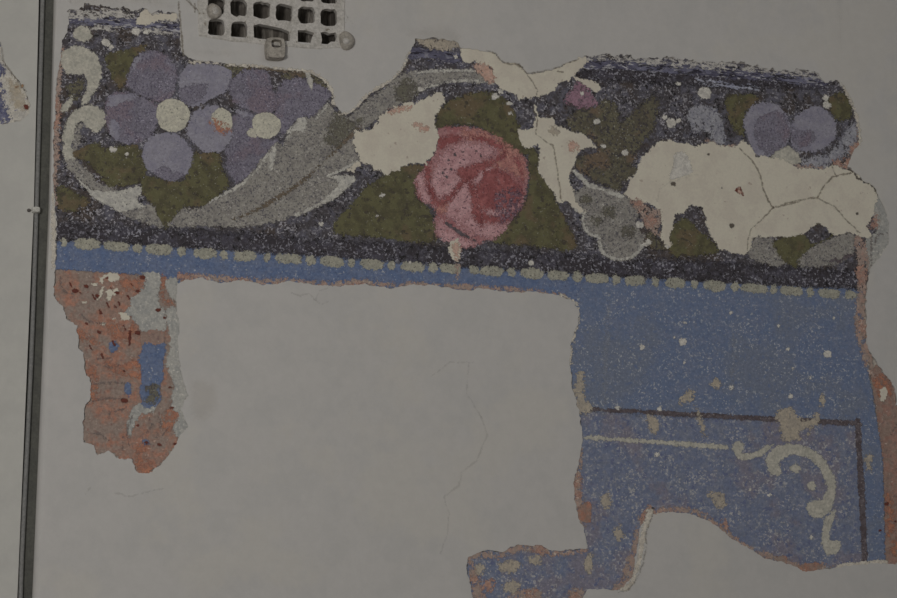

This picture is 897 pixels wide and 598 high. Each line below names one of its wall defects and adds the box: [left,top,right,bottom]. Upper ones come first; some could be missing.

crack [740,149,878,233]